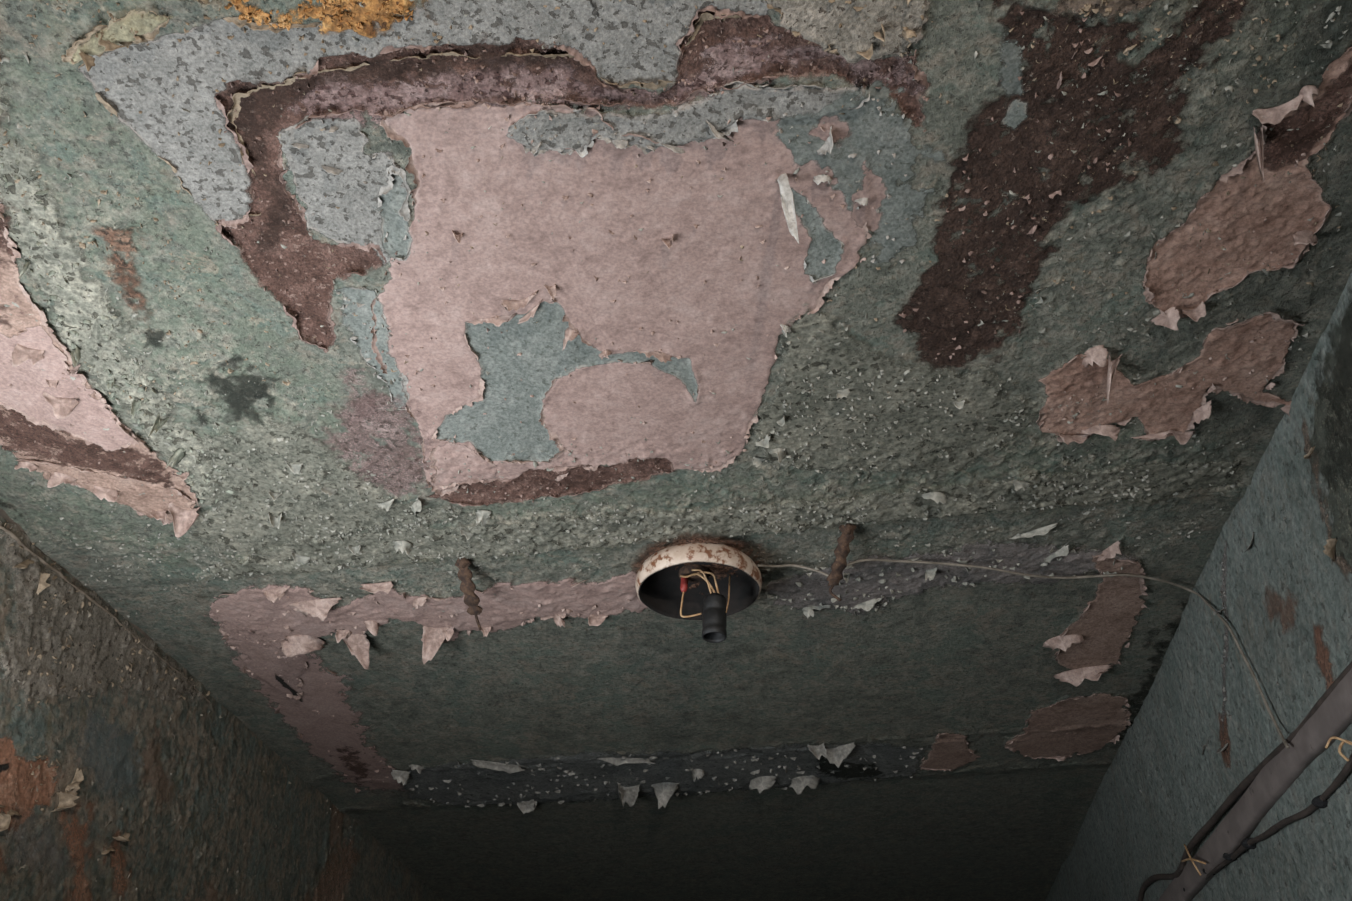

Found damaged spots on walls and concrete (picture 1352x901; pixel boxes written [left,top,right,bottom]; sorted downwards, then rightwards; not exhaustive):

peeling [1005,16,1081,107]
peeling [1123,2,1243,90]
peeling [1250,18,1295,94]
peeling [1057,40,1172,192]
peeling [1,116,140,321]
peeling [992,190,1113,243]
peeling [964,258,1128,336]
flaking render [0,737,138,901]